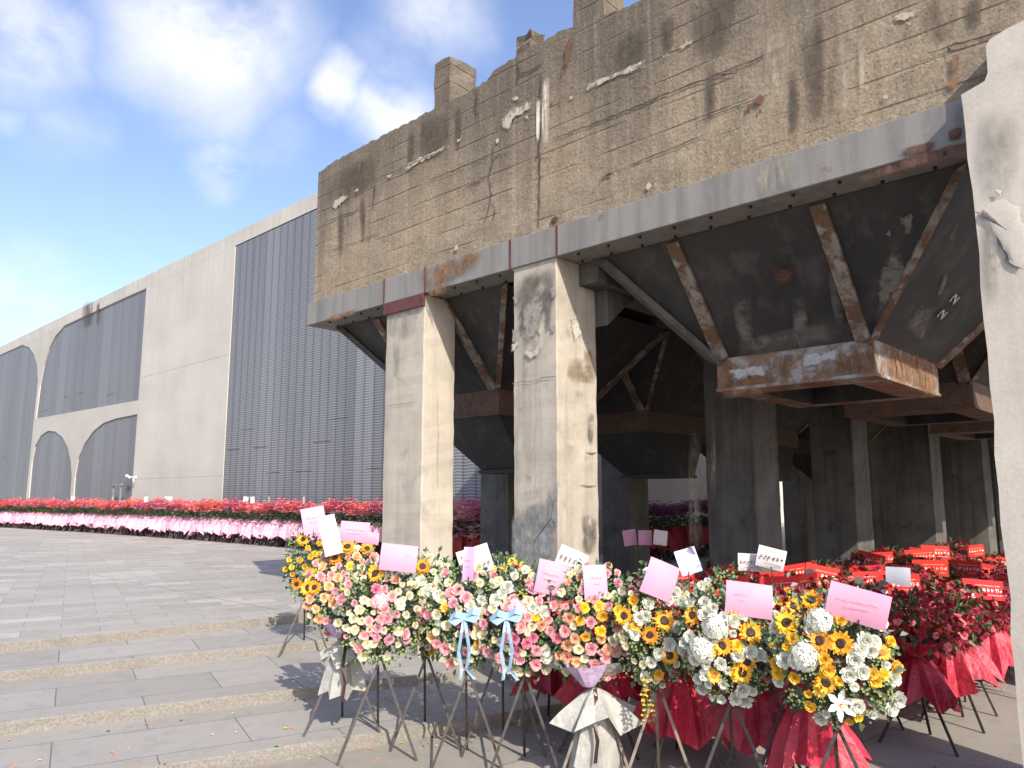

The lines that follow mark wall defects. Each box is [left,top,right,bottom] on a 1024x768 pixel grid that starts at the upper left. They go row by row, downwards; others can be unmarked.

peeling [587,61,642,90]
damp [408,111,461,163]
spalling [496,96,530,143]
crack [516,43,789,227]
crack [327,143,506,221]
rust [425,255,475,296]
peeling [512,284,556,359]
rust [724,357,790,396]
rust [830,343,875,376]
rust [888,347,936,392]